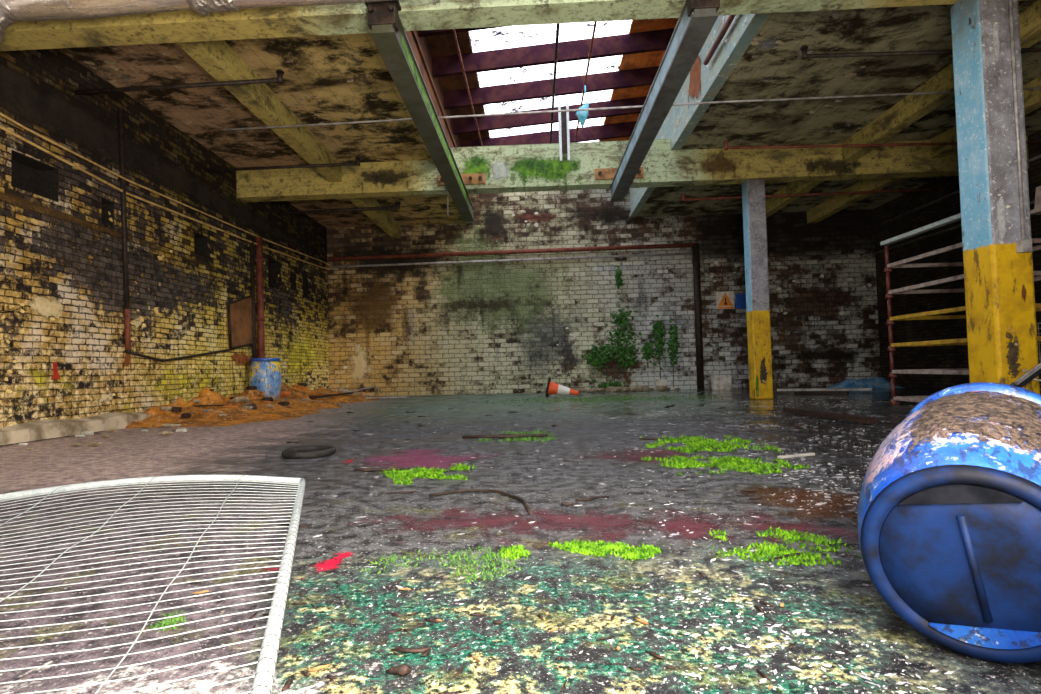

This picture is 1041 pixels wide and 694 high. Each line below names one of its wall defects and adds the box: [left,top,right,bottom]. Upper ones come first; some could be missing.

damp [361,152,408,185]
damp [804,158,860,175]
damp [409,298,574,375]
damp [663,304,687,373]
corrosion [232,348,258,366]
damp [344,340,377,387]
damp [785,349,857,363]